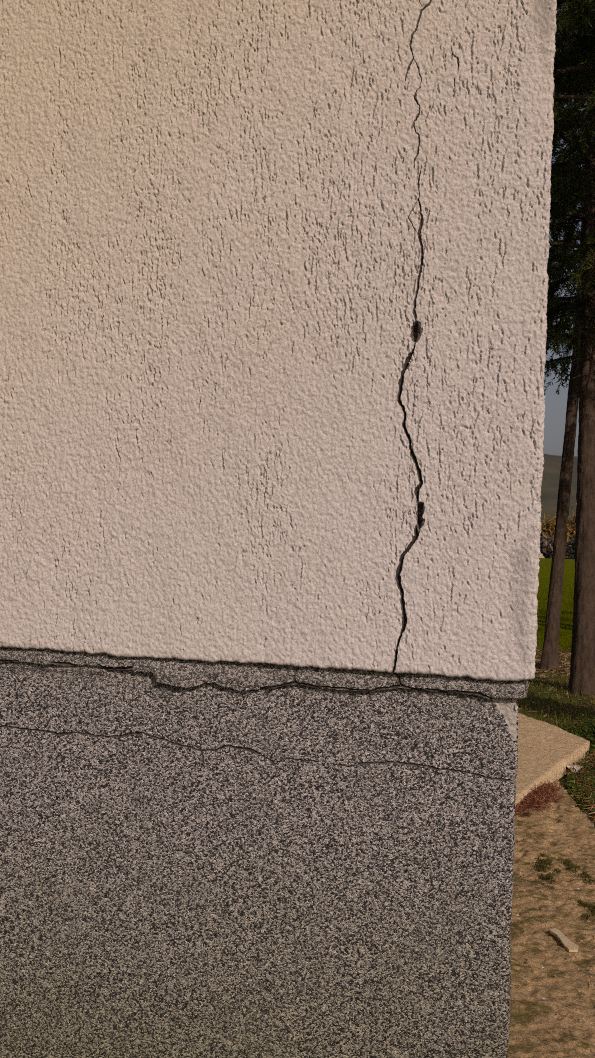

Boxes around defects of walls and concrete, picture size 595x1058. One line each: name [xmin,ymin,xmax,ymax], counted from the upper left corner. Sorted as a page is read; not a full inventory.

crack [260,0,491,698]
crack [50,662,133,671]
crack [0,725,512,781]